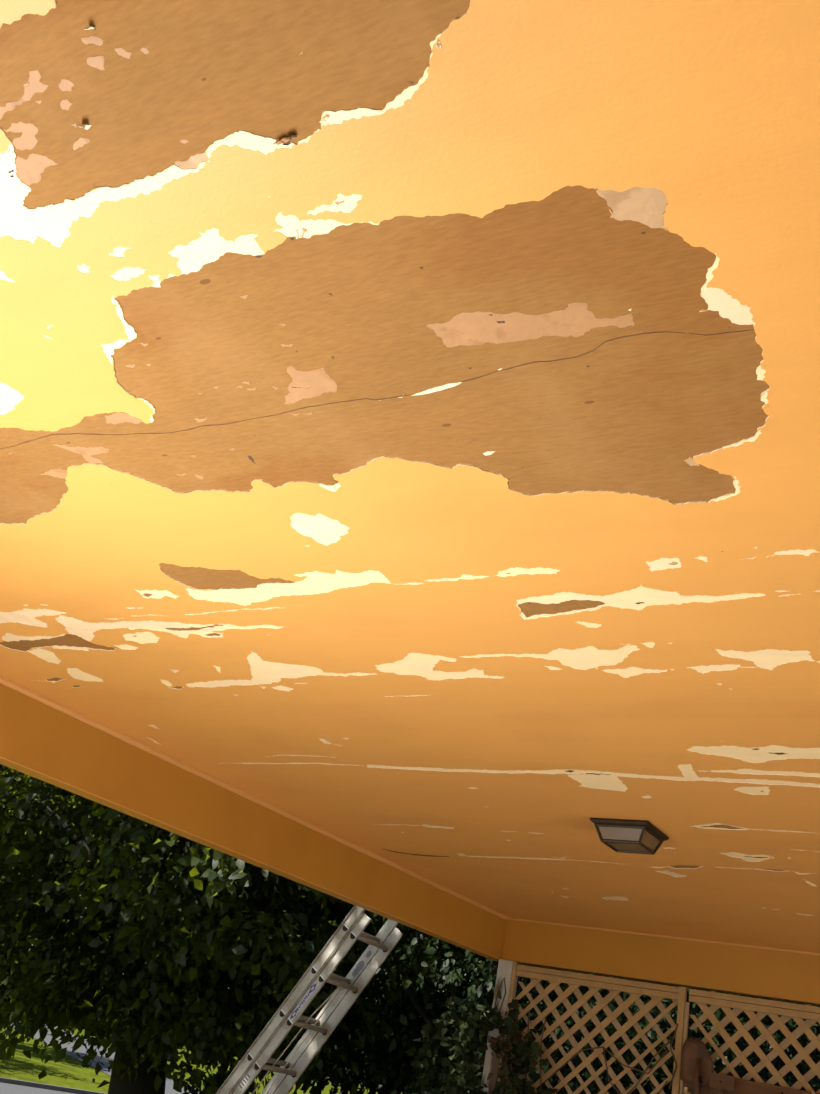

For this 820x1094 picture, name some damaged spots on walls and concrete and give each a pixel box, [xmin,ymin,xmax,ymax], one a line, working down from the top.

peeling [0,0,471,248]
peeling [0,185,770,525]
crack [461,329,754,382]
crack [1,395,407,449]
peeling [290,513,349,547]
peeling [0,563,560,688]
peeling [516,585,798,628]
peeling [161,642,674,696]
peeling [687,649,820,690]
peeling [242,738,820,795]